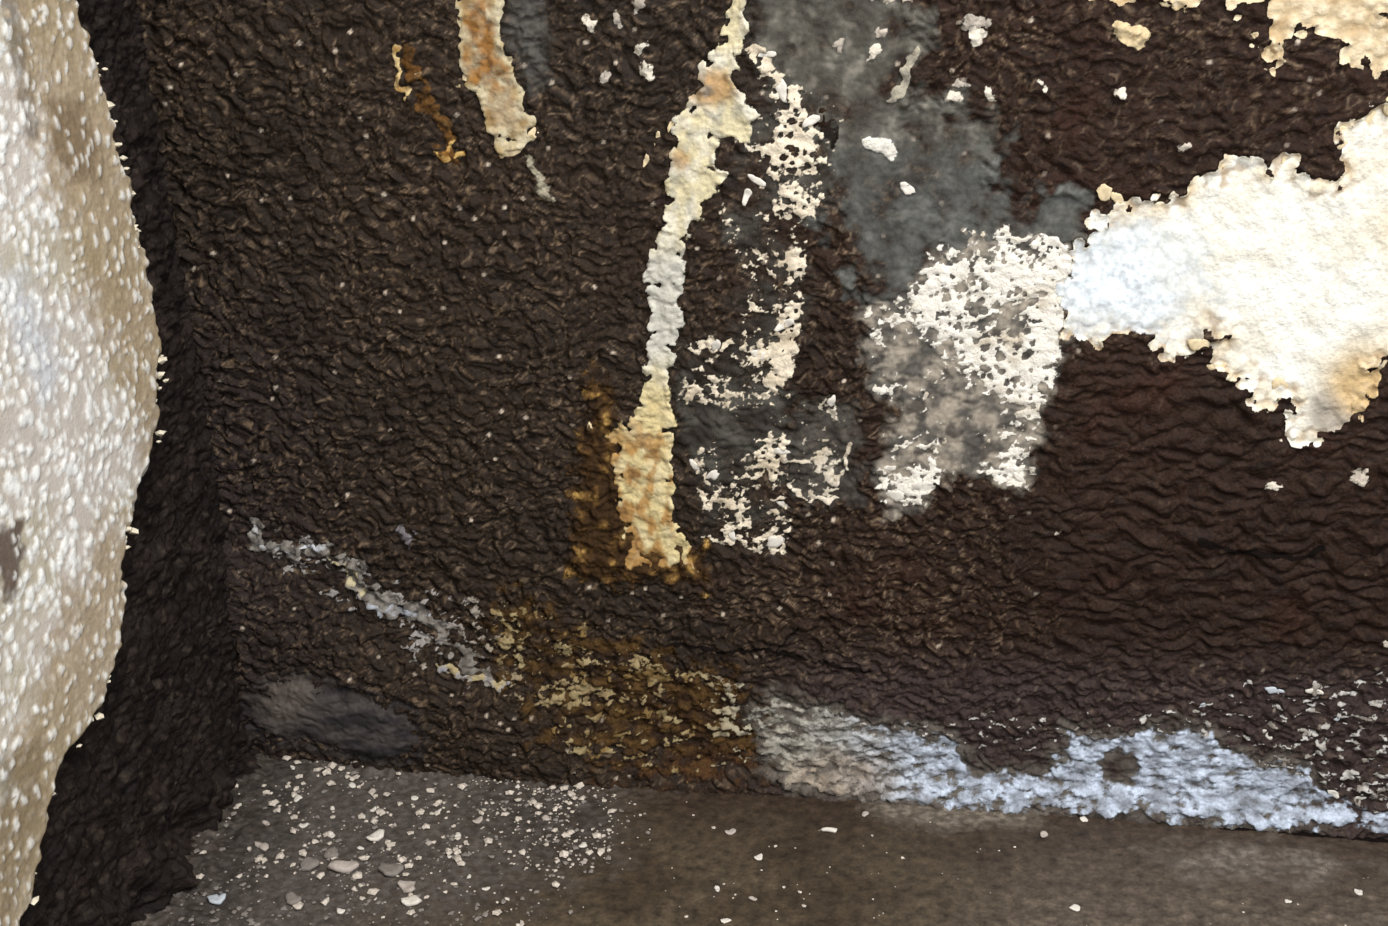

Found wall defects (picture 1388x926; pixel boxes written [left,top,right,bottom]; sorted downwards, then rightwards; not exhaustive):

spalling [581,0,645,32]
spalling [634,43,655,81]
spalling [961,14,992,47]
spalling [1089,0,1151,50]
peeling [1159,0,1203,12]
peeling [1225,0,1388,79]
corrosion [392,44,466,165]
water stain [564,0,1094,599]
peeling [676,38,1388,555]
corrosion [475,583,774,791]
water stain [745,672,1388,833]
water stain [1178,846,1338,887]